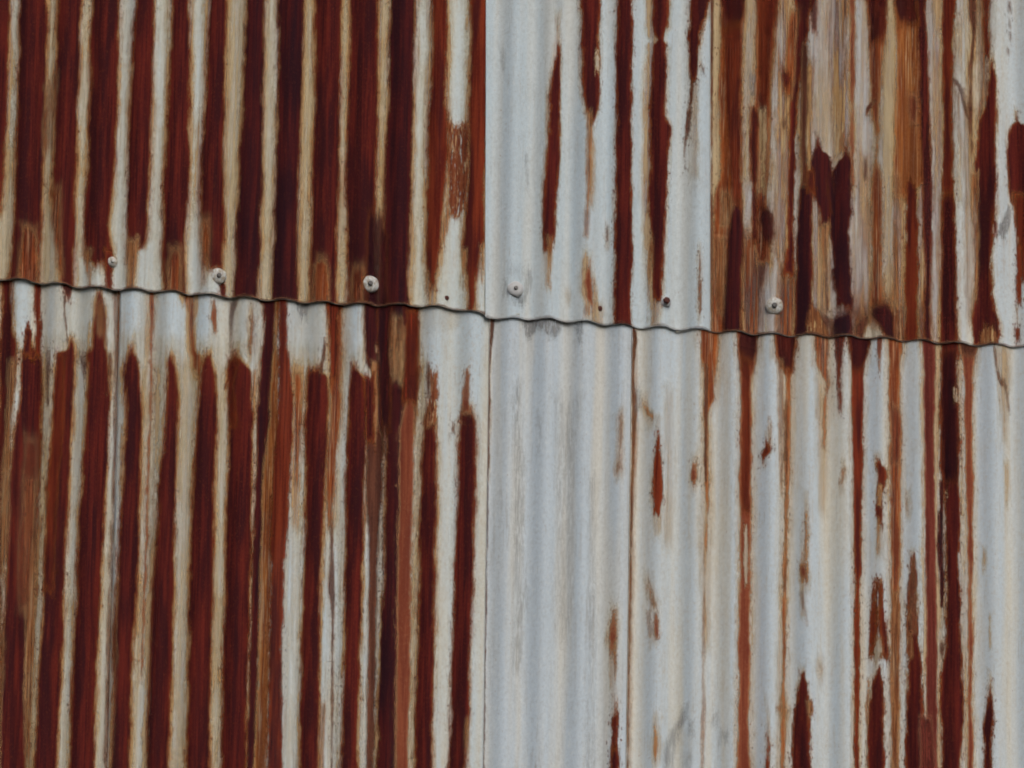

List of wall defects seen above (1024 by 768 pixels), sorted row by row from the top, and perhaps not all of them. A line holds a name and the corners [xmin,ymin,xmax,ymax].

rust [0,0,495,768]
rust [541,44,562,269]
rust [580,0,665,768]
rust [647,0,1024,768]